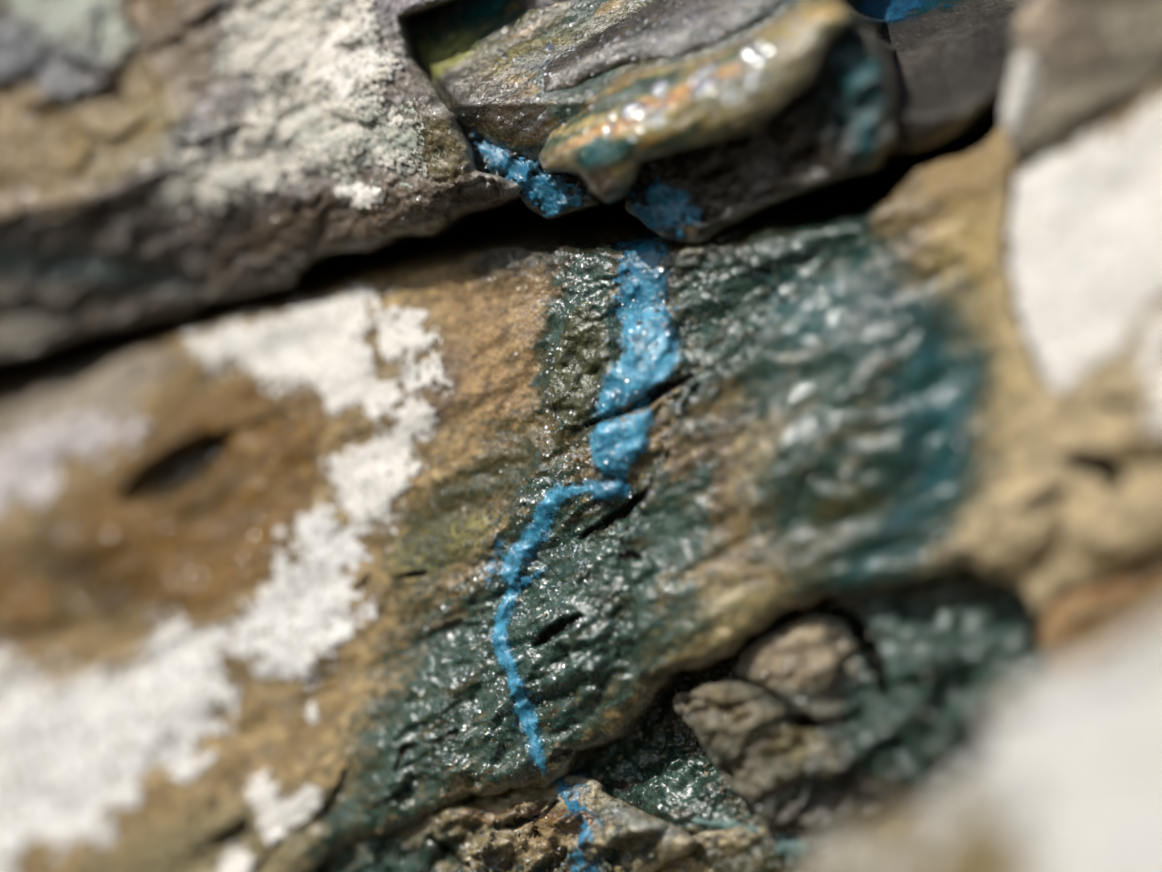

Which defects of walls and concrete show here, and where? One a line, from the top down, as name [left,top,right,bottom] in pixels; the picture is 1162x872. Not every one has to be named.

crack [583,343,756,560]
crack [534,612,583,647]